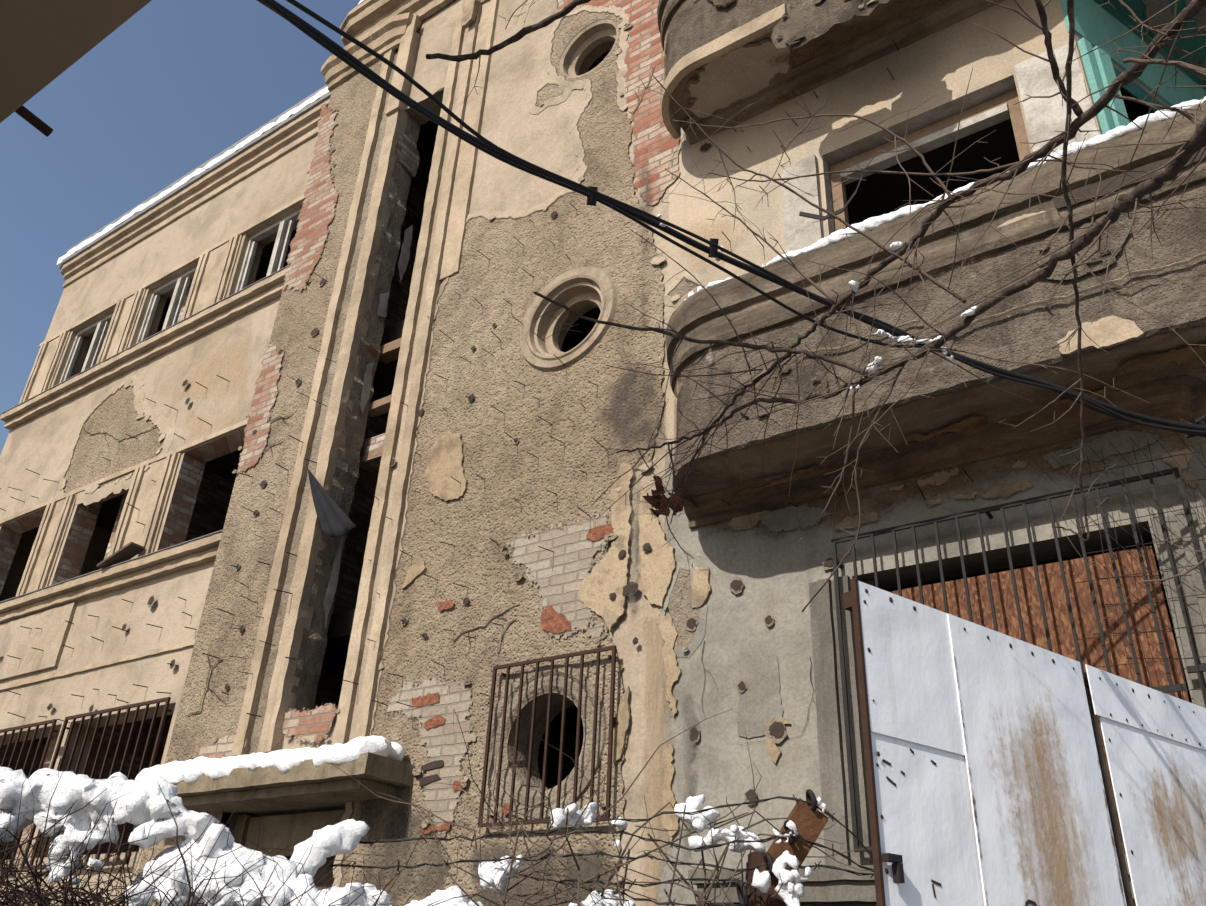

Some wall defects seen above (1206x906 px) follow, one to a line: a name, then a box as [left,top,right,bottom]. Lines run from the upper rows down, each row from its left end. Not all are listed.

peeling [686,0,889,119]
peeling [1140,0,1206,38]
flaking render [282,104,340,292]
flaking render [1057,315,1144,356]
flaking render [57,371,176,506]
flaking render [232,340,284,473]
flaking render [332,0,712,906]
peeling [728,504,831,532]
spalling [729,577,744,594]
flaking render [282,703,340,744]
corrosion [1009,714,1080,906]
corrosion [1153,770,1206,866]